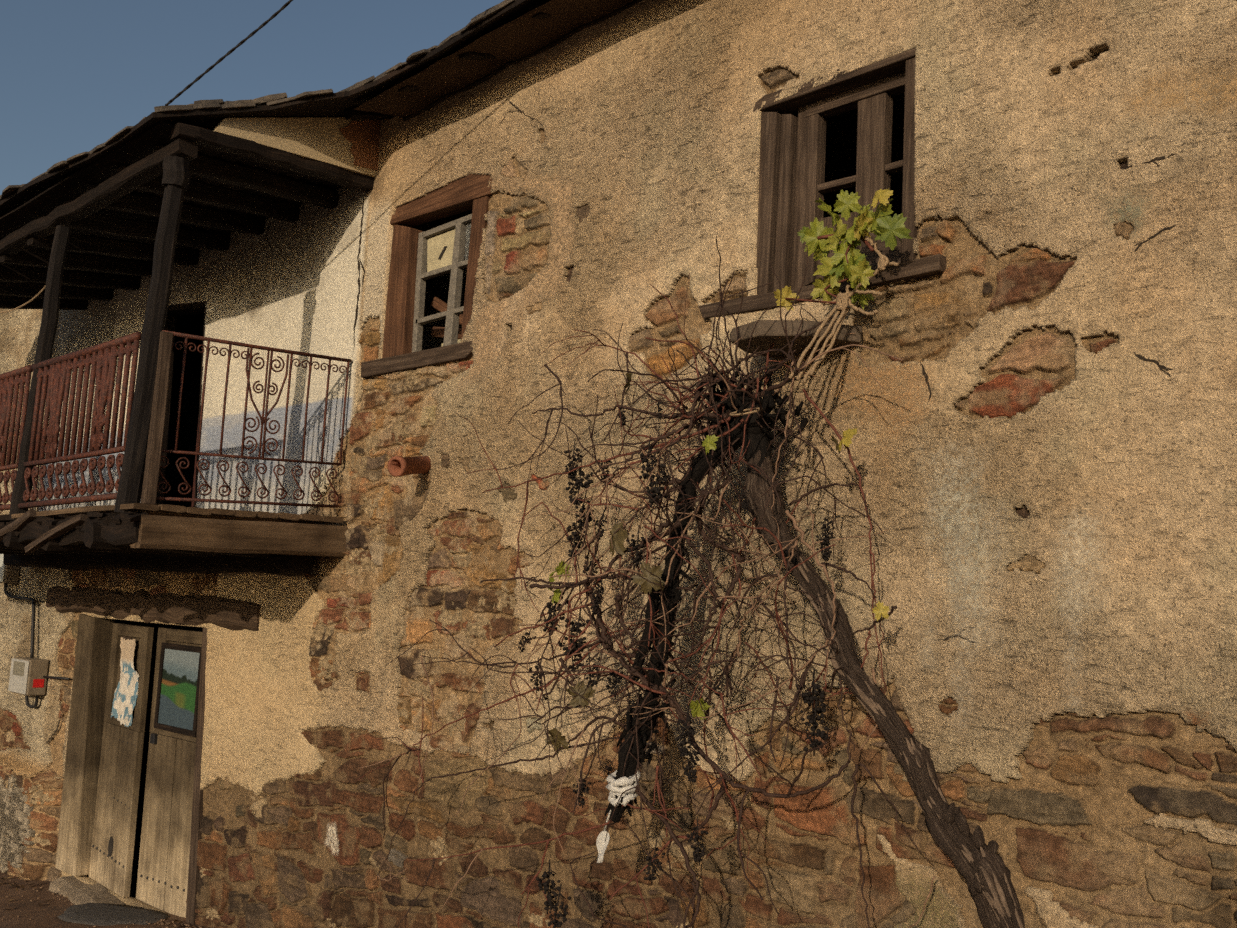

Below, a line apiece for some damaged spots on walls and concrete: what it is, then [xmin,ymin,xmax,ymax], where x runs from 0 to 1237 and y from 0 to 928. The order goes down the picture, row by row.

crack [353,192,365,341]
flaking render [485,192,551,303]
flaking render [629,270,748,382]
flaking render [852,217,1077,366]
flaking render [954,326,1119,420]
flaking render [304,317,473,691]
flaking render [497,483,517,502]
flaking render [0,612,82,882]
flaking render [185,509,984,928]
flaking render [936,710,1237,928]